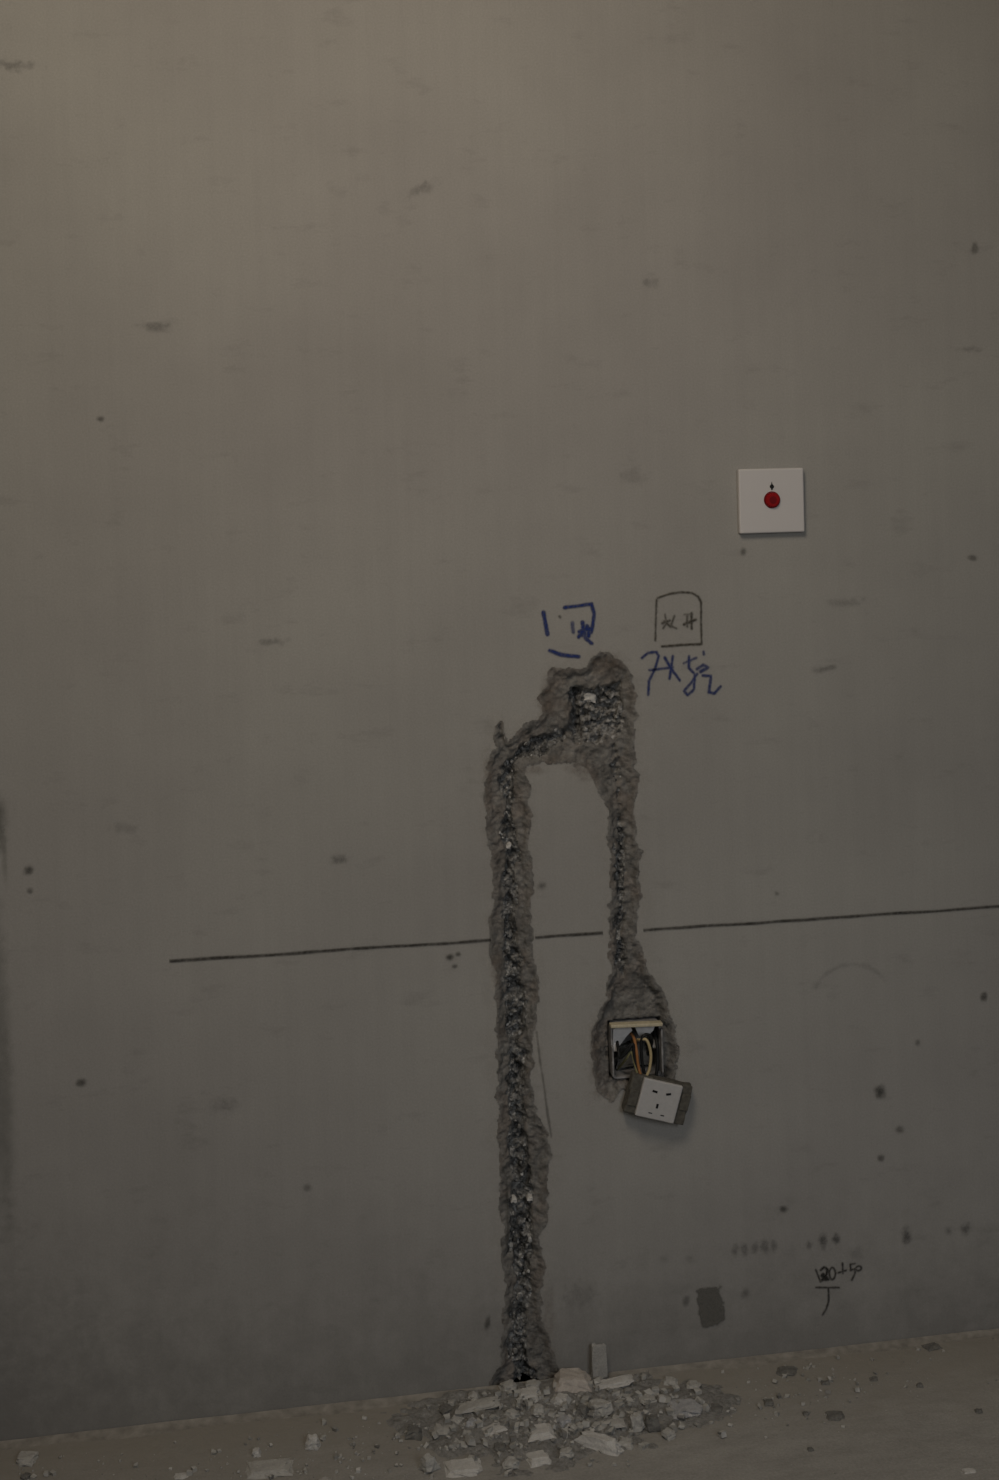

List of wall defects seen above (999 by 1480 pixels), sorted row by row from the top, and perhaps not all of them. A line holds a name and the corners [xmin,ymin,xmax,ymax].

spalling [483,651,680,1386]